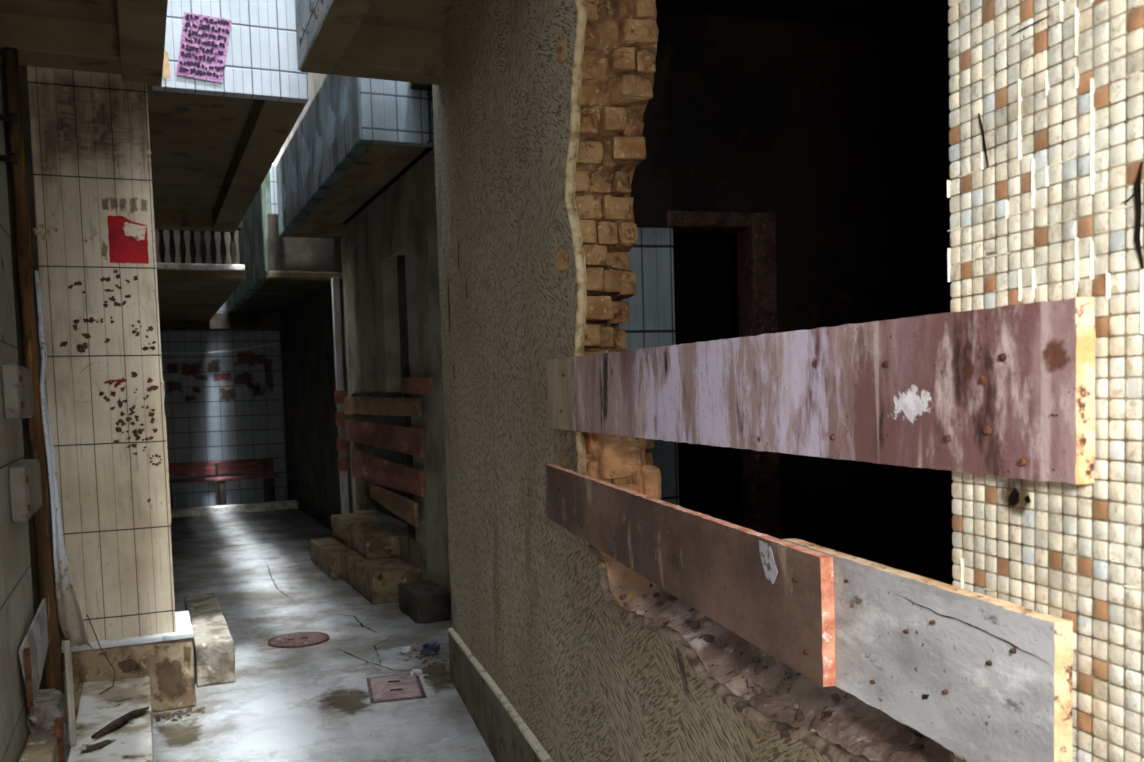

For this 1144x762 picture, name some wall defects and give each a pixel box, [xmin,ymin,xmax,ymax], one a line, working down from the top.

spalling [555,0,659,357]
crack [1121,162,1144,269]
spalling [1002,483,1031,514]